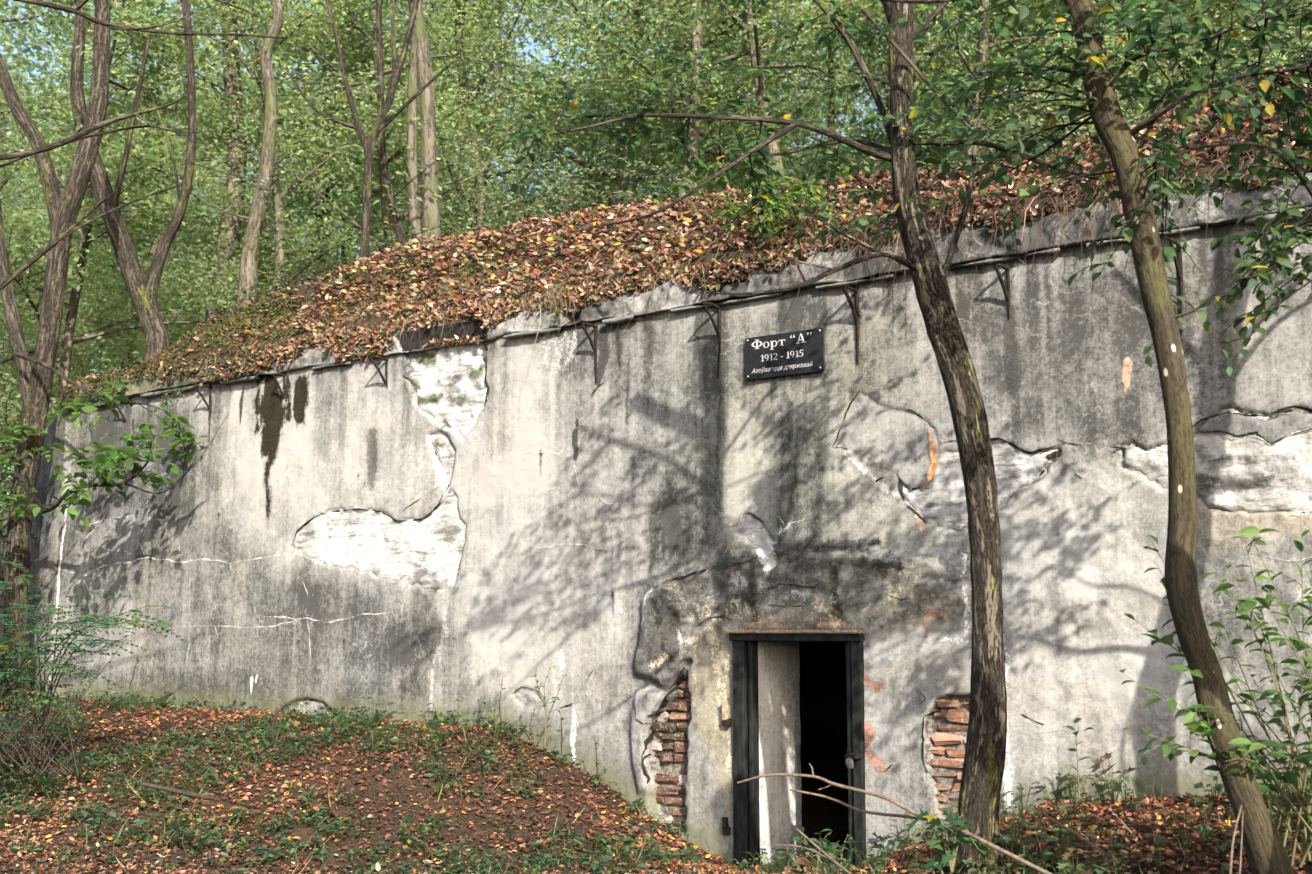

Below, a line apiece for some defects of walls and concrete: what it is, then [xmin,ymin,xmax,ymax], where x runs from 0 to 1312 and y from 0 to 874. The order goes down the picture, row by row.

flaking render [399,320,489,439]
water stain [239,374,310,520]
flaking render [831,391,968,535]
flaking render [990,438,1062,509]
flaking render [1110,444,1168,489]
flaking render [1193,405,1312,514]
water stain [56,508,67,609]
flaking render [293,487,466,591]
flaking render [728,512,790,572]
water stain [428,593,449,710]
flaking render [641,664,691,833]
flaking render [919,692,970,818]